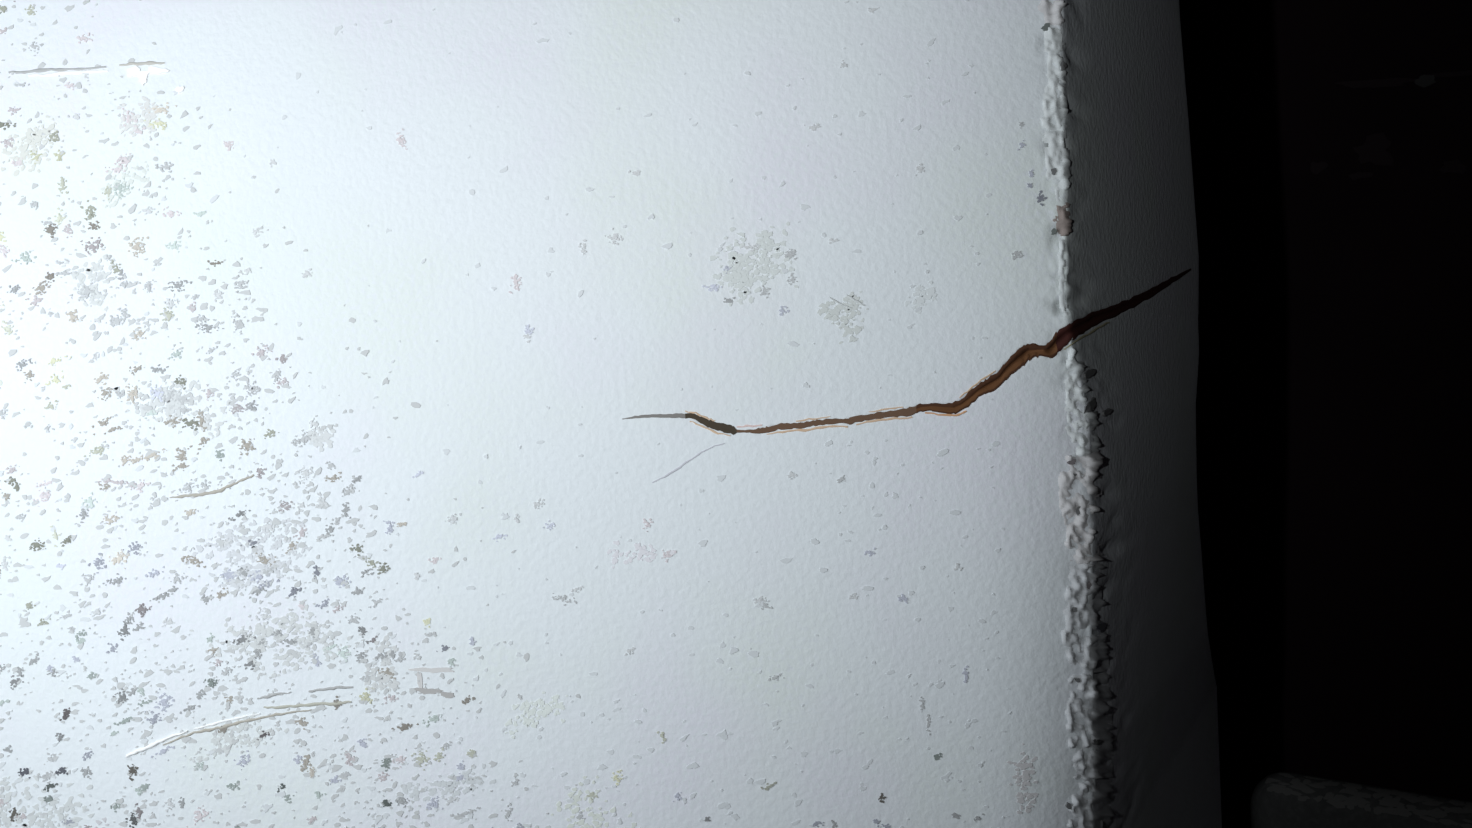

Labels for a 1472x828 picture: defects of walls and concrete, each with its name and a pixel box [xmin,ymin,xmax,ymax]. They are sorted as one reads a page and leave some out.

crack [622,268,1191,483]